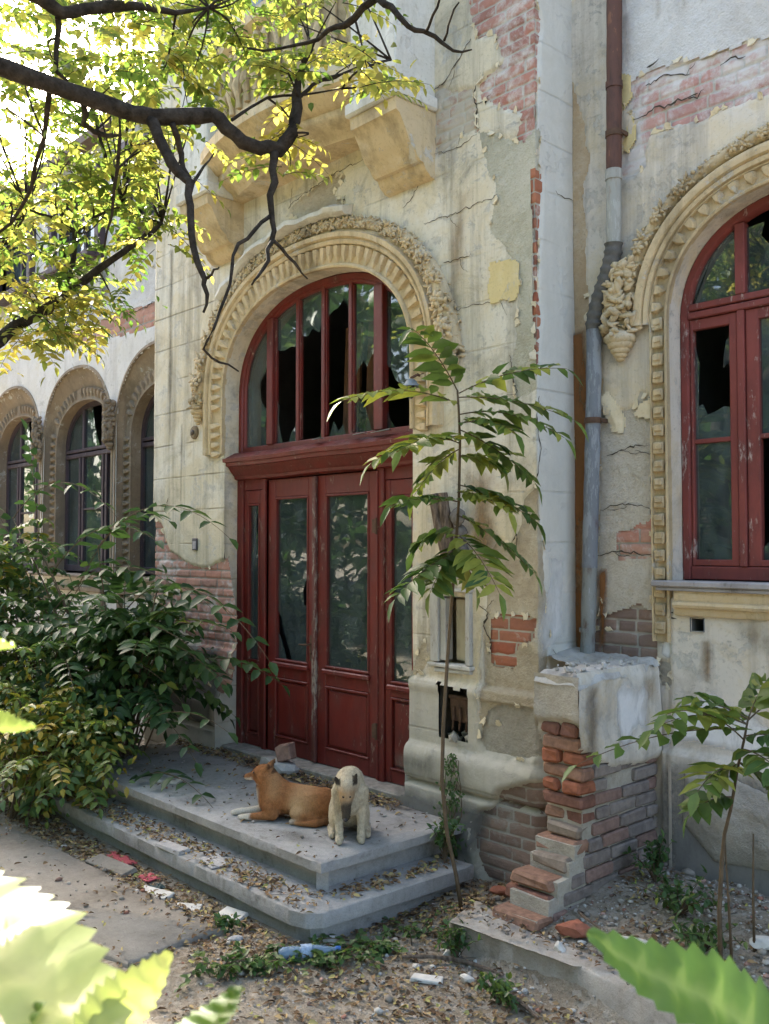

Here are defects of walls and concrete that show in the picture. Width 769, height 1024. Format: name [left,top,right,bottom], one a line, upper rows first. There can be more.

crack [633,61,702,120]
flaking render [622,0,769,178]
crack [426,194,497,225]
spalling [434,0,542,399]
peeling [572,82,590,363]
flaking render [154,517,238,694]
spalling [440,485,552,762]
crack [598,549,650,557]
crack [604,445,651,514]
spalling [595,378,673,690]
flaking render [477,782,548,883]